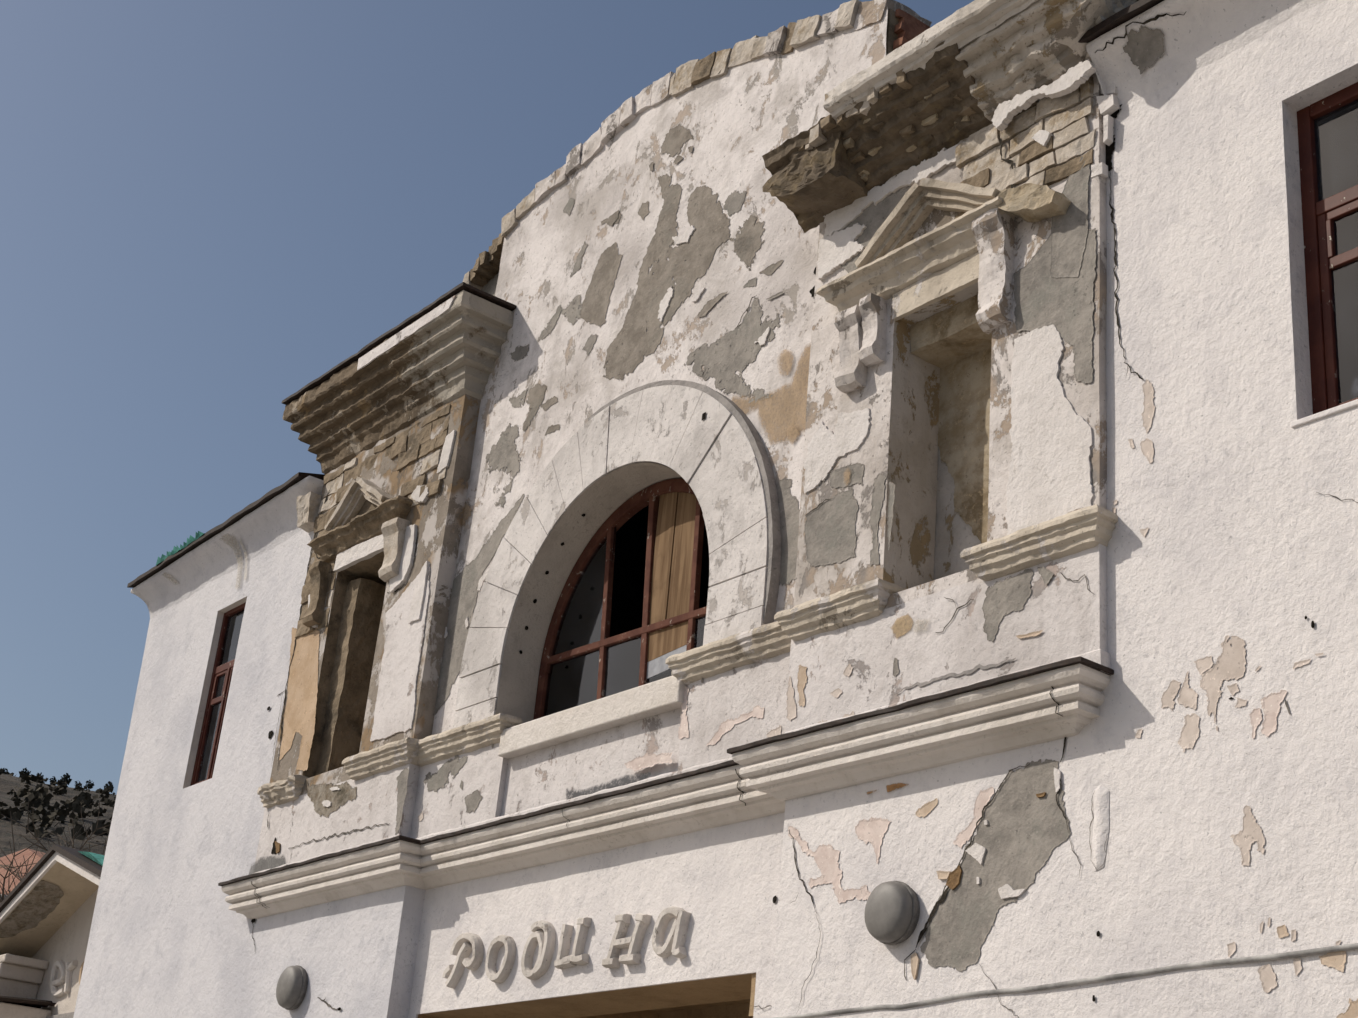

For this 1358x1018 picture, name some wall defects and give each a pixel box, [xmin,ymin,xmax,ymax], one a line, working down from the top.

crack [1095,12,1186,53]
spalling [510,124,783,403]
flaking render [816,59,1097,384]
crack [1109,173,1144,380]
spalling [279,553,357,817]
flaking render [313,404,456,536]
spalling [776,463,895,586]
crack [936,597,974,633]
crack [1056,571,1094,594]
spalling [395,755,482,835]
crack [754,829,821,1012]
spalling [911,759,1071,980]